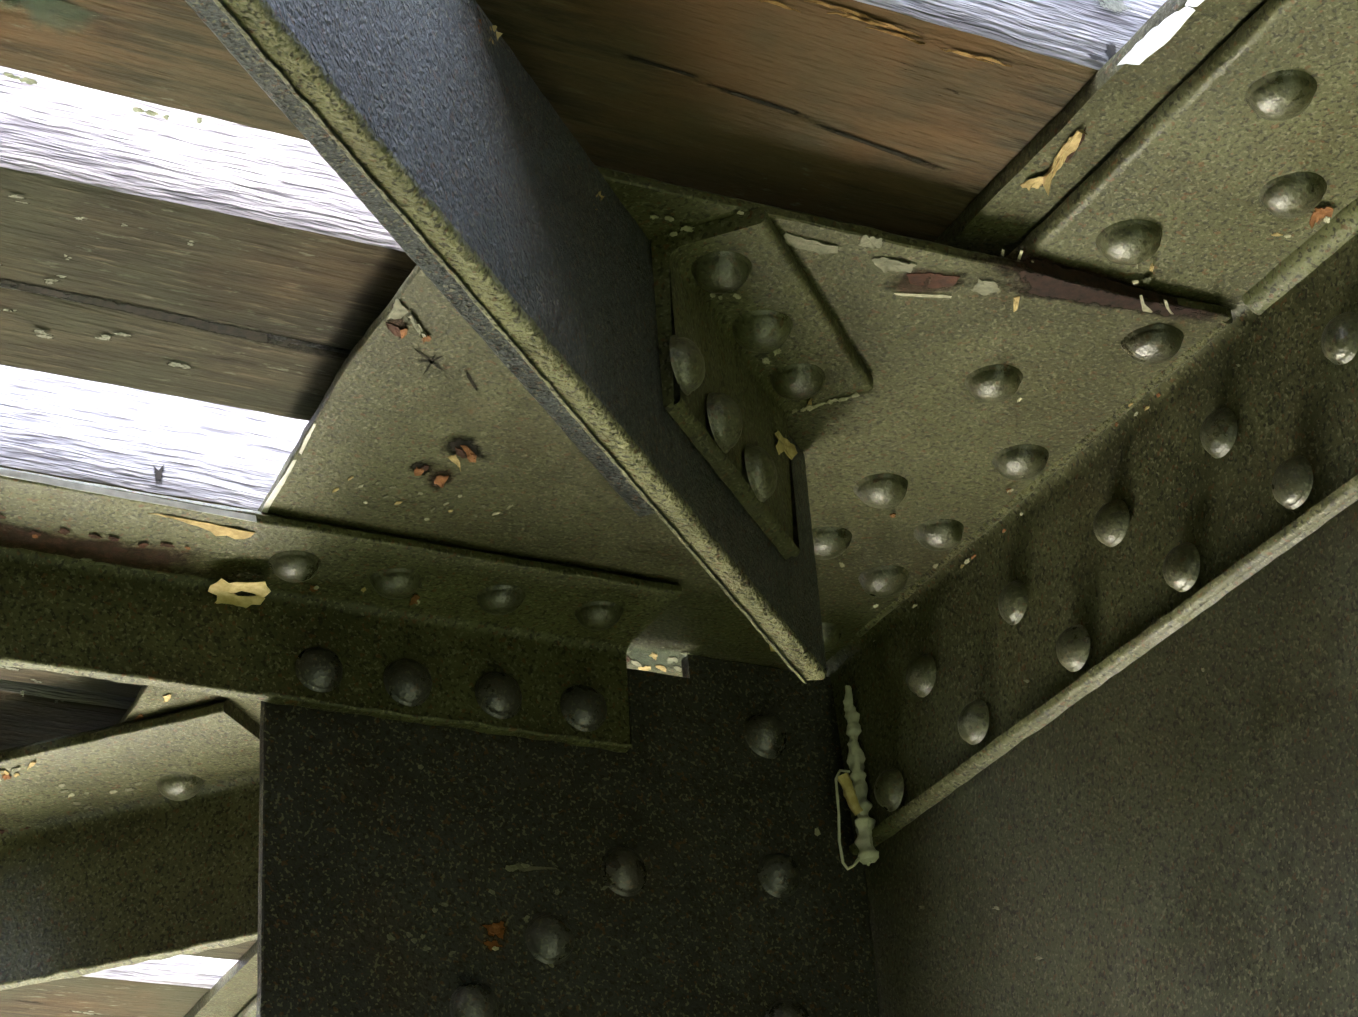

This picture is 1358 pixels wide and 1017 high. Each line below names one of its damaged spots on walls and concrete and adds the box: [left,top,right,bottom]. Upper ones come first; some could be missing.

peeling [1021,130,1087,196]
peeling [783,232,838,255]
peeling [858,234,999,298]
rust [410,438,486,490]
peeling [774,430,798,460]
rust [0,514,198,576]
peeling [208,578,271,608]